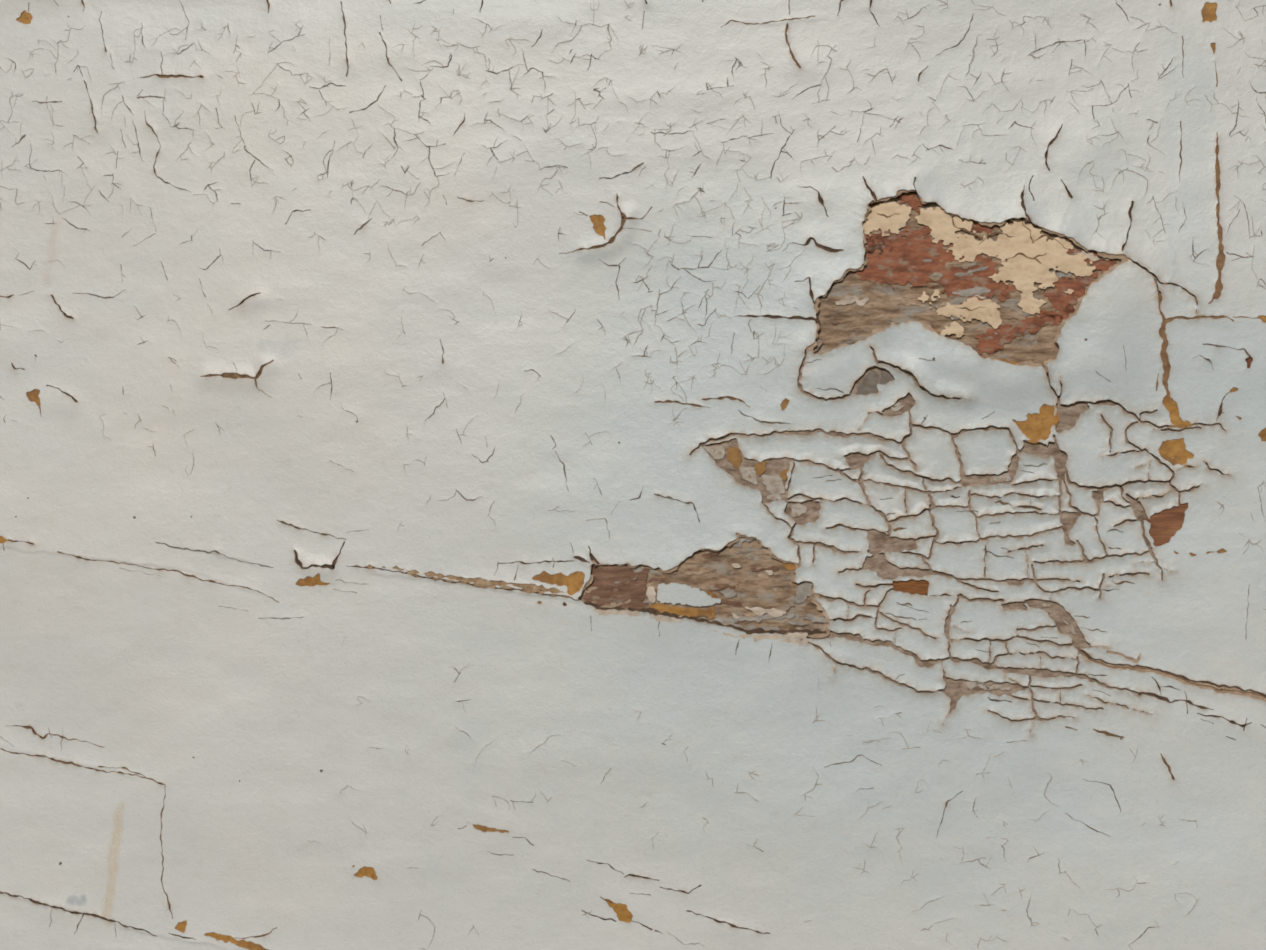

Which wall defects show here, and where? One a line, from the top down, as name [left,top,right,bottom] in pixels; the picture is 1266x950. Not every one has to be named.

crack [11,431,700,631]
peeling [366,190,1229,721]
crack [1217,480,1266,633]
crack [0,725,196,940]
crack [452,665,492,769]
crack [661,734,759,801]
crack [1083,645,1266,740]
crack [238,927,277,939]